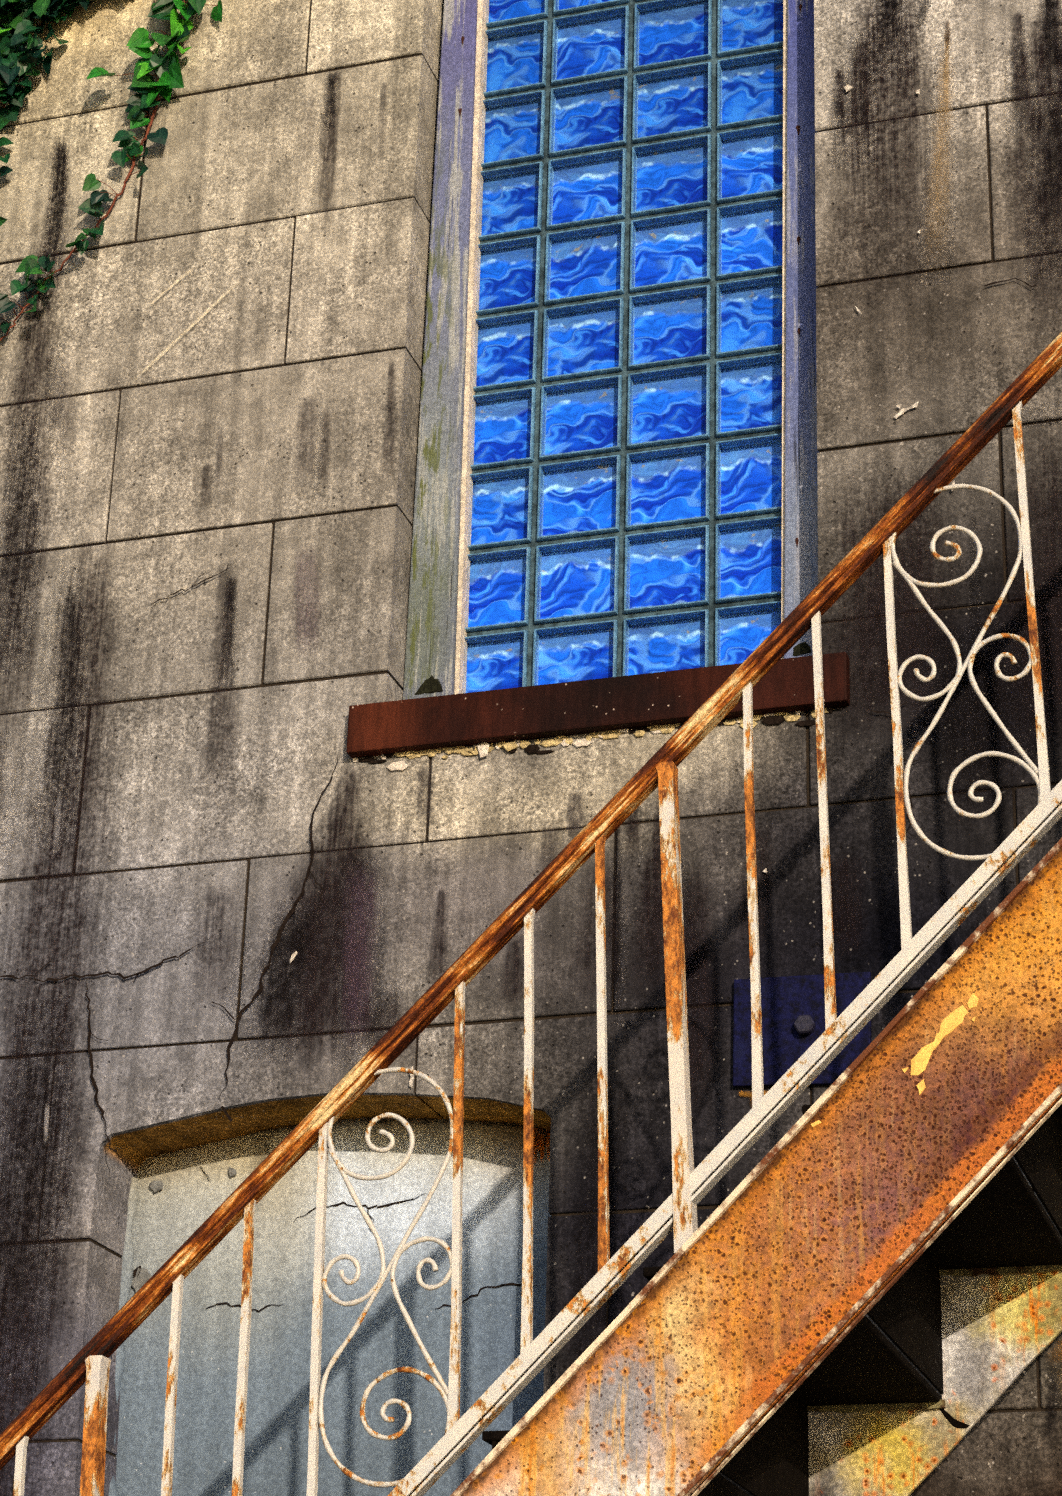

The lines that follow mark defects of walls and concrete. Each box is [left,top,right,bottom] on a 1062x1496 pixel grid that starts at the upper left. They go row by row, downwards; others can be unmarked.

water stain [834,0,950,236]
water stain [1011,0,1062,307]
water stain [0,147,68,713]
water stain [0,569,109,1433]
crack [0,931,221,1152]
crack [212,754,339,1122]
corrosion [533,1127,550,1161]
water stain [0,1428,42,1496]
corrosion [940,1409,970,1428]